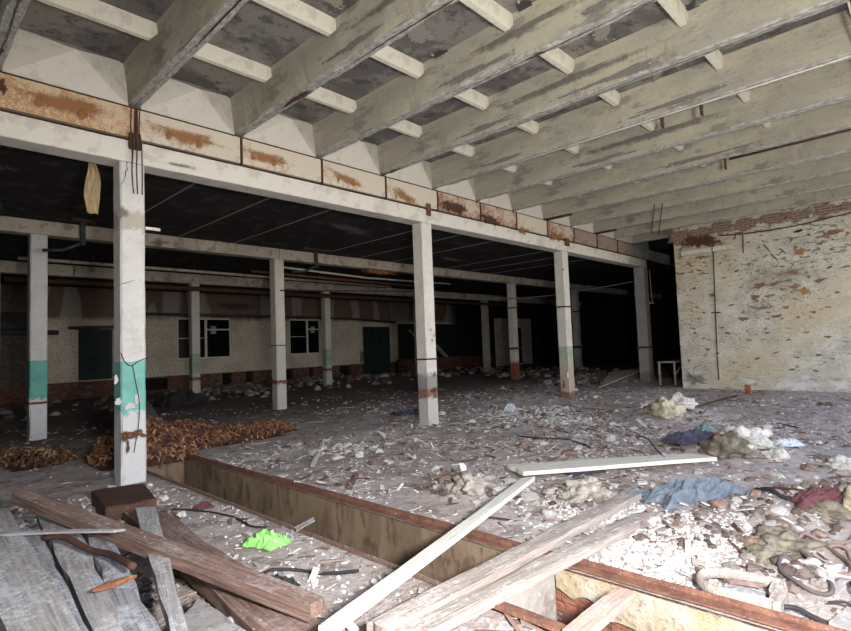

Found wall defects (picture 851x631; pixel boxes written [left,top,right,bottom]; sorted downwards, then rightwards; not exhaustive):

corrosion [0,79,113,122]
corrosion [145,120,222,149]
corrosion [248,149,287,166]
corrosion [325,167,361,186]
corrosion [390,187,415,205]
corrosion [440,201,467,216]
flaking render [669,202,851,246]
peeling [751,244,806,300]
peeling [115,394,141,410]